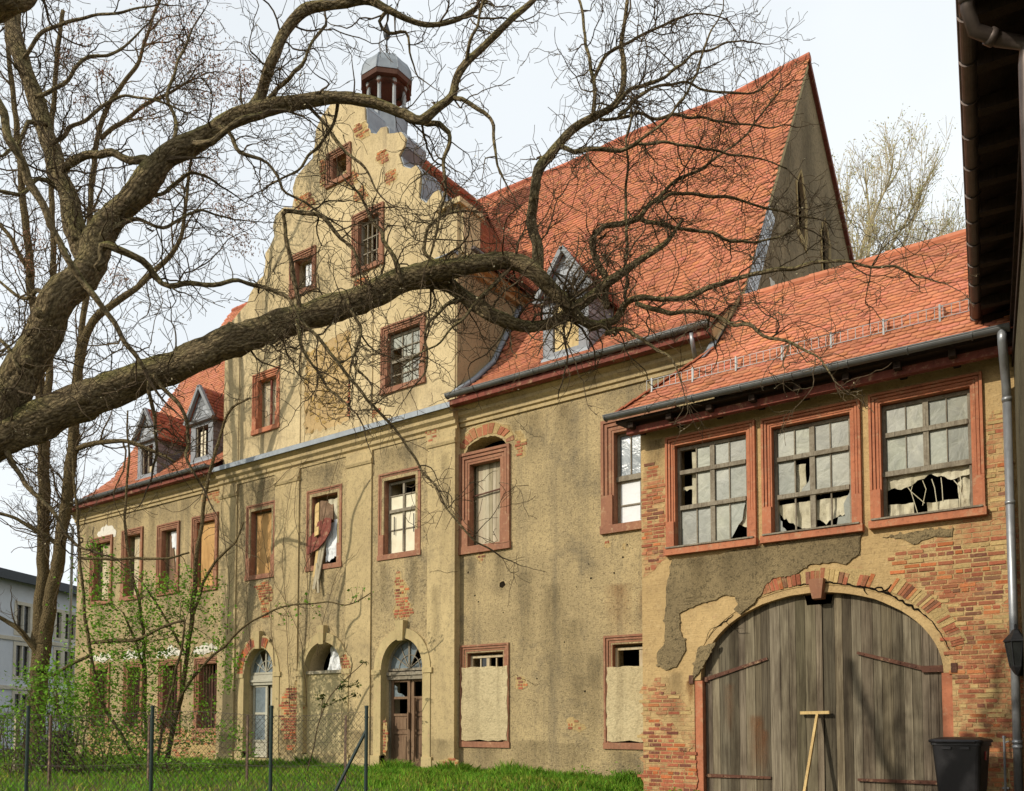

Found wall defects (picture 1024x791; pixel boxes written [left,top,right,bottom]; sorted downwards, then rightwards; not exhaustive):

flaking render [254,578,274,620]
flaking render [392,570,414,621]
flaking render [637,460,875,791]
crack [796,581,950,650]
flaking render [884,527,1024,791]
flaking render [279,679,305,754]